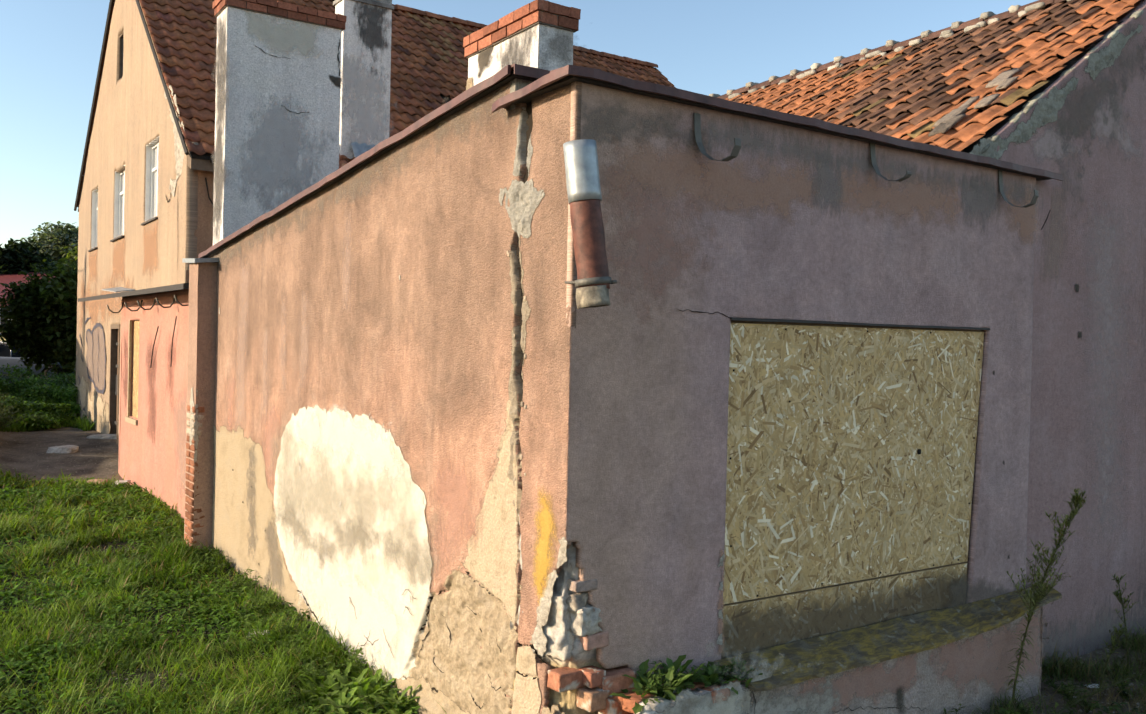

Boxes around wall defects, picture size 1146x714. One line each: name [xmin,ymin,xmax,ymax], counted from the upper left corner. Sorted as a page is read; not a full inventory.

flaking render [970,10,1143,159]
crack [512,101,533,183]
corrosion [570,199,610,289]
crack [507,237,531,526]
flaking render [408,399,636,714]
leakage [533,492,553,597]
peeling [930,614,1042,693]